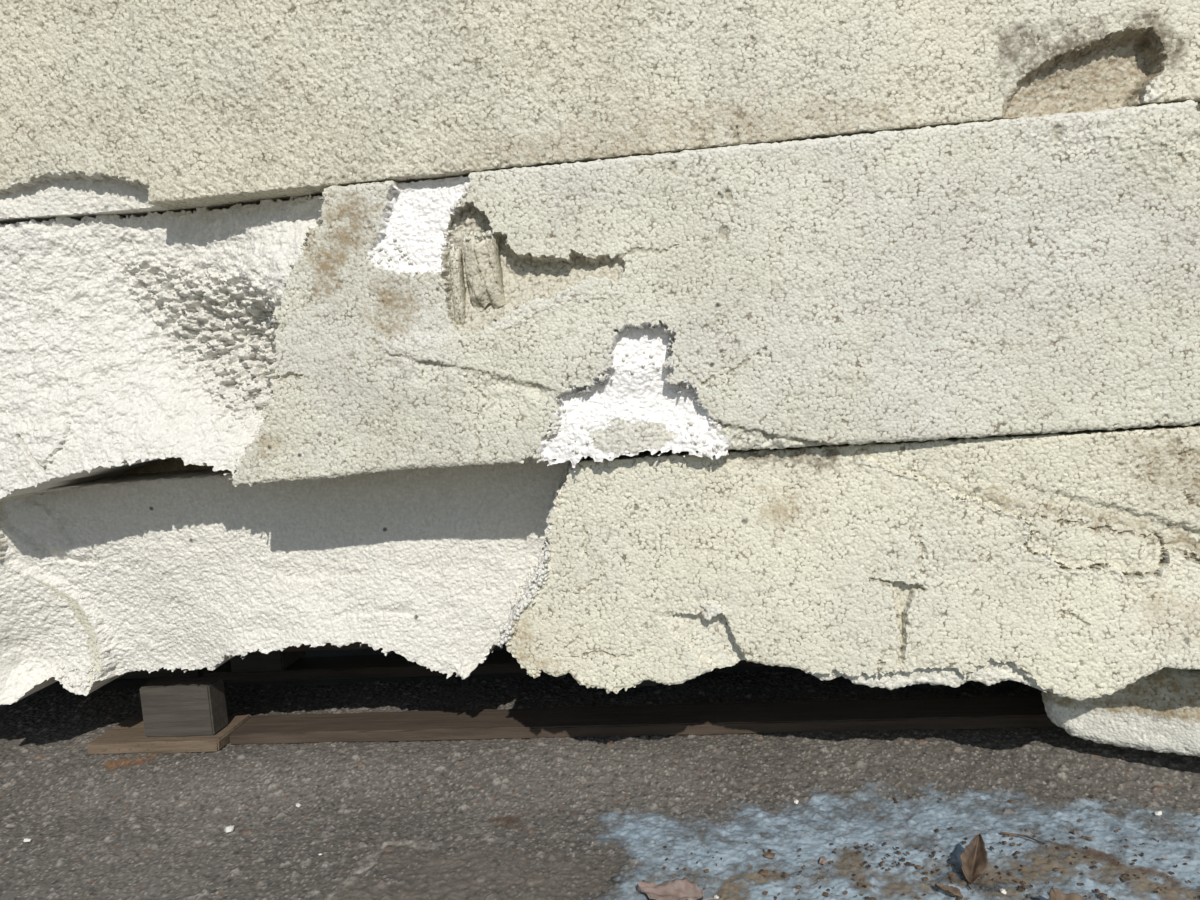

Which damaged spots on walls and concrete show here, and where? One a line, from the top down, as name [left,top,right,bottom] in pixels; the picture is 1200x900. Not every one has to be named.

spalling [0,170,729,705]
crack [869,524,929,671]
crack [1023,515,1200,580]
crack [1180,489,1200,508]